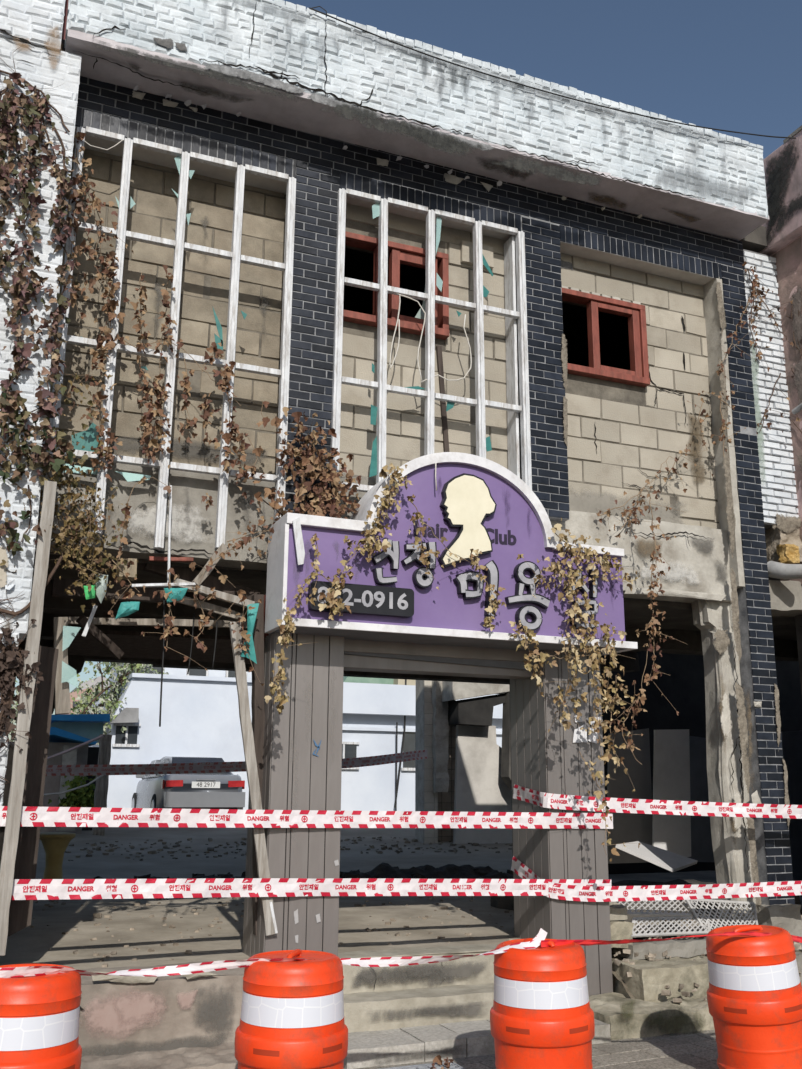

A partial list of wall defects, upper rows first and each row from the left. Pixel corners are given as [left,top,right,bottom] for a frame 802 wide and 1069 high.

crack [0,25,206,93]
water stain [324,104,482,155]
crack [199,2,706,199]
water stain [482,157,626,208]
mould [765,140,802,244]
crack [631,531,711,546]